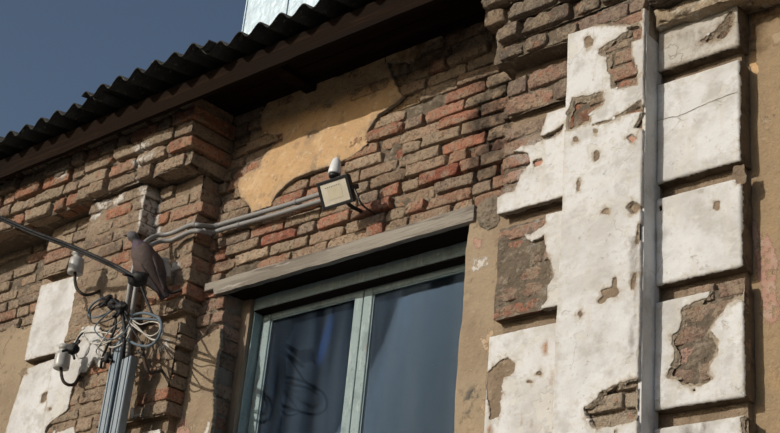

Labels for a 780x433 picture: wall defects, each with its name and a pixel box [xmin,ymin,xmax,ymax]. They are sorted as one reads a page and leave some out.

flaking render [566,0,648,143]
flaking render [701,10,780,74]
flaking render [238,27,463,213]
crack [657,92,736,121]
peeling [598,278,619,304]
flaking render [667,221,779,391]
flaking render [41,325,106,433]
peeling [480,358,515,420]
flaking render [585,379,639,433]